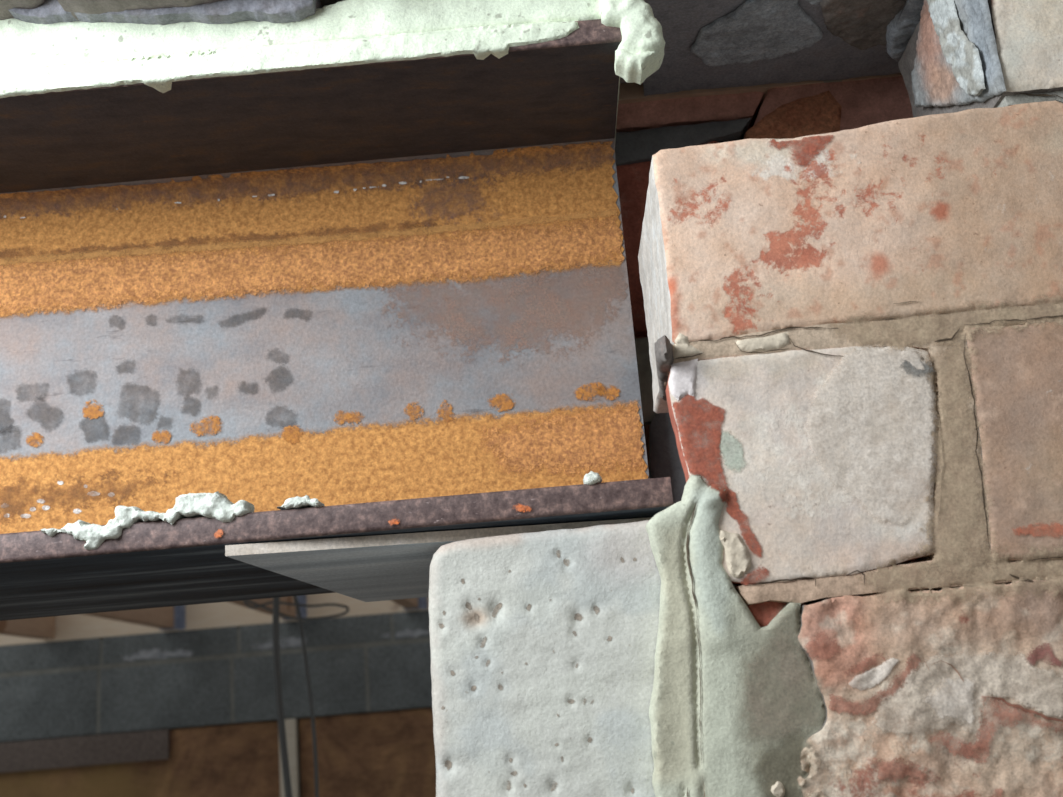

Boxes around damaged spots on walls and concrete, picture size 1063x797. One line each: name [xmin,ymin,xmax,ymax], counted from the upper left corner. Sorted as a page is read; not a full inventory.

corrosion [0,141,625,318]
corrosion [0,382,648,534]
leakage [746,618,827,797]
peeling [868,758,940,797]
peeling [828,643,1063,763]
crack [923,658,1063,722]